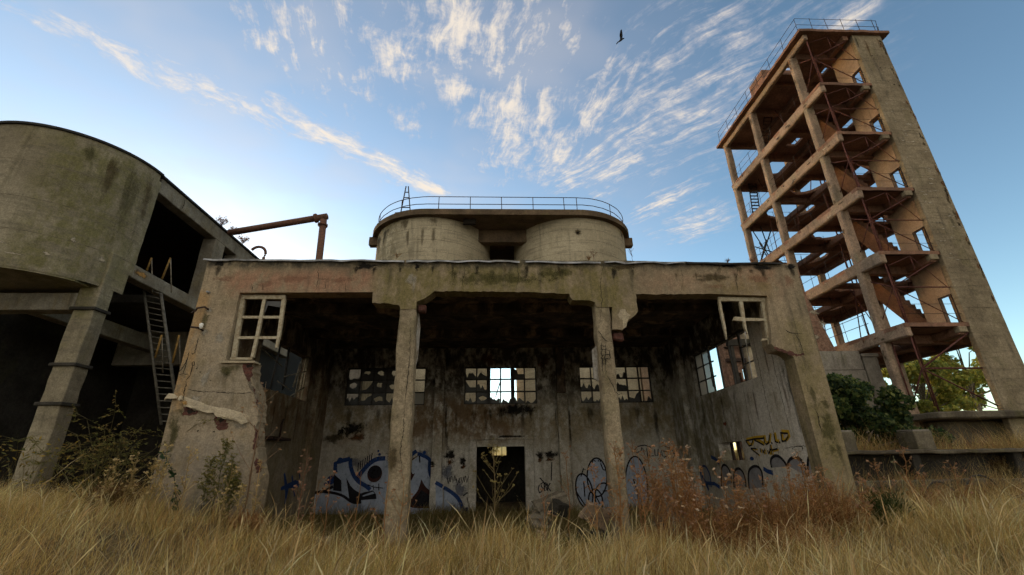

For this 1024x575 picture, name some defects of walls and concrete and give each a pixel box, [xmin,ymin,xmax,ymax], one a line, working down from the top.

damp [463,266,567,284]
crack [179,340,251,399]
flaking render [600,309,630,374]
flaking render [164,363,262,473]